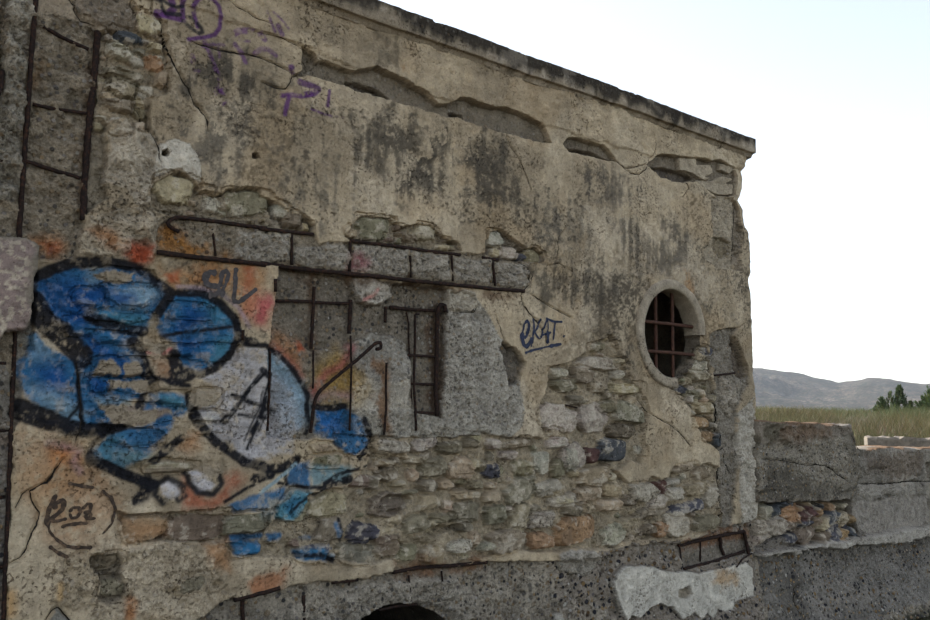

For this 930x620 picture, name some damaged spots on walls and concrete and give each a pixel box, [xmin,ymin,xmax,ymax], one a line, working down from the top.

corrosion [16,0,101,238]
spalling [0,0,164,260]
damp [172,30,696,321]
corrosion [155,215,525,437]
spalling [165,217,535,440]
flaking render [92,553,125,595]
spalling [197,596,269,620]
flaking render [223,512,265,535]
spalling [314,561,516,620]
spalling [496,327,769,620]
corrosion [677,522,753,590]